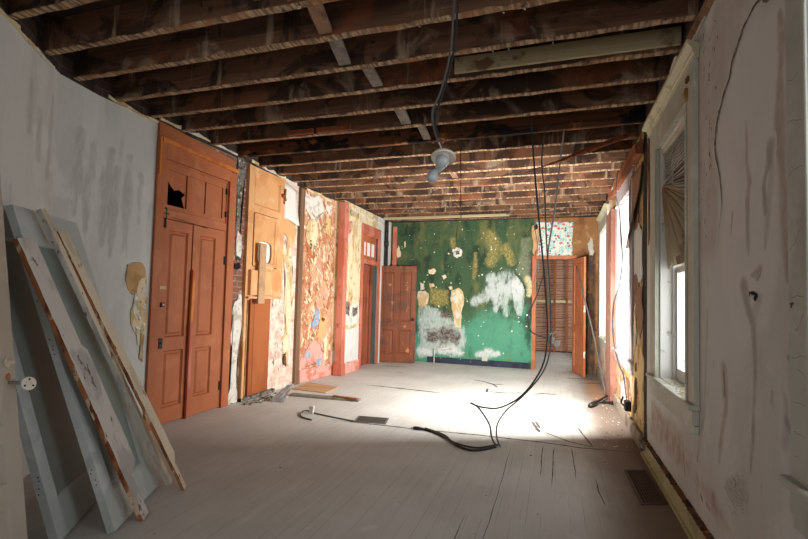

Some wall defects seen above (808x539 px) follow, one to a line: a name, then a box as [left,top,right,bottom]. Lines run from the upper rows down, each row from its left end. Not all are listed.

flaking render [125,262,148,362]
flaking render [108,94,297,270]
flaking render [228,293,242,405]
peeling [272,218,296,371]
peeling [299,188,335,368]
peeling [417,267,468,330]
peeling [448,229,463,258]
peeling [471,224,538,299]
peeling [616,138,650,423]
leakage [738,3,791,479]